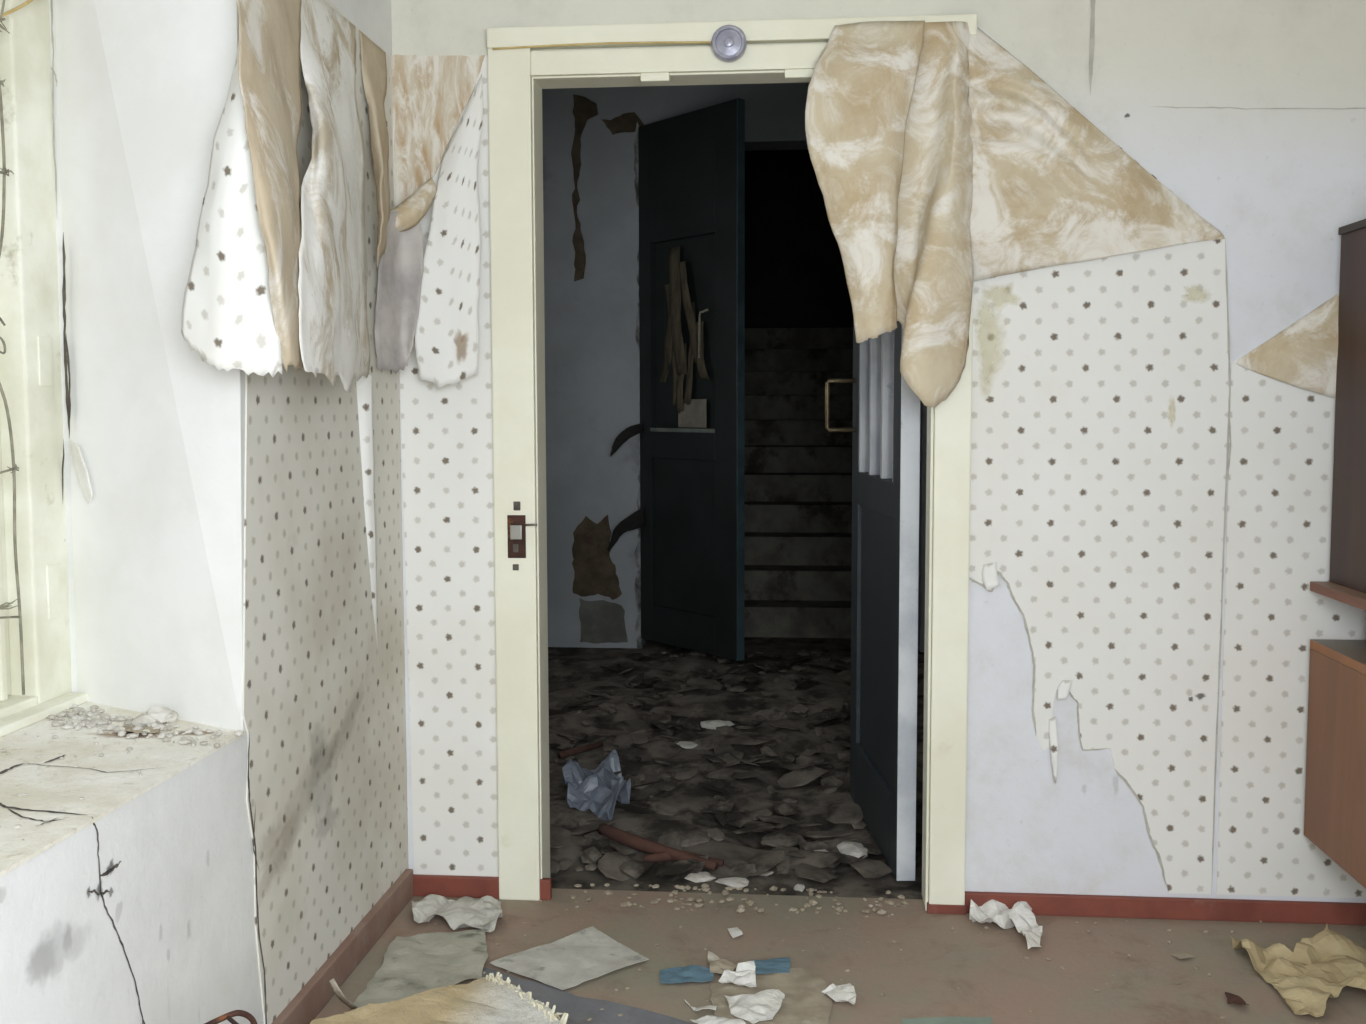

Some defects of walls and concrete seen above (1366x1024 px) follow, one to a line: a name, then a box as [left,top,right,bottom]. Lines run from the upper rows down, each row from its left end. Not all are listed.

flaking render [571,94,644,424]
flaking render [572,515,644,648]
peeling [1049,716,1058,783]
crack [0,754,167,1024]